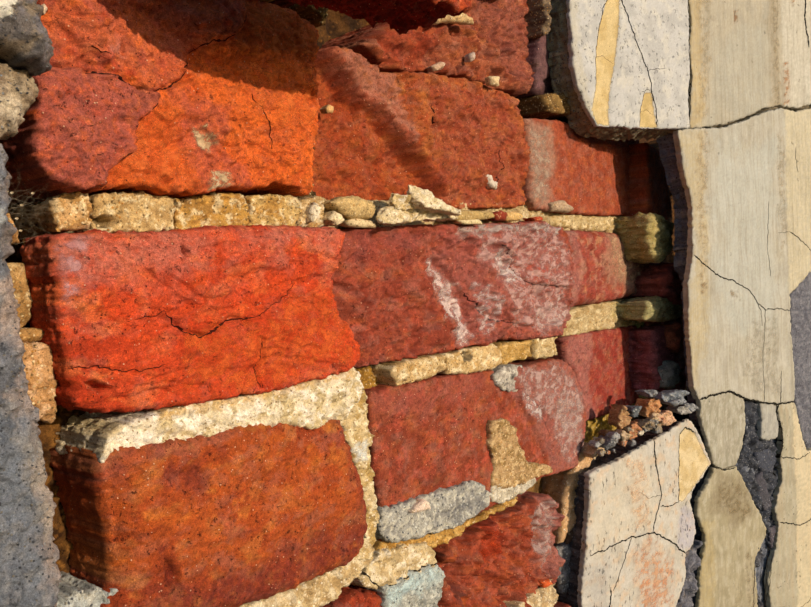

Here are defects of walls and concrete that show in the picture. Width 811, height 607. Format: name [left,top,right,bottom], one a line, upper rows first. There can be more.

crack [595,0,665,124]
crack [686,2,694,120]
crack [135,284,294,338]
water stain [426,262,468,344]
water stain [455,223,575,331]
crack [695,256,789,350]
crack [767,203,810,276]
crack [65,364,163,372]
crack [591,371,810,607]